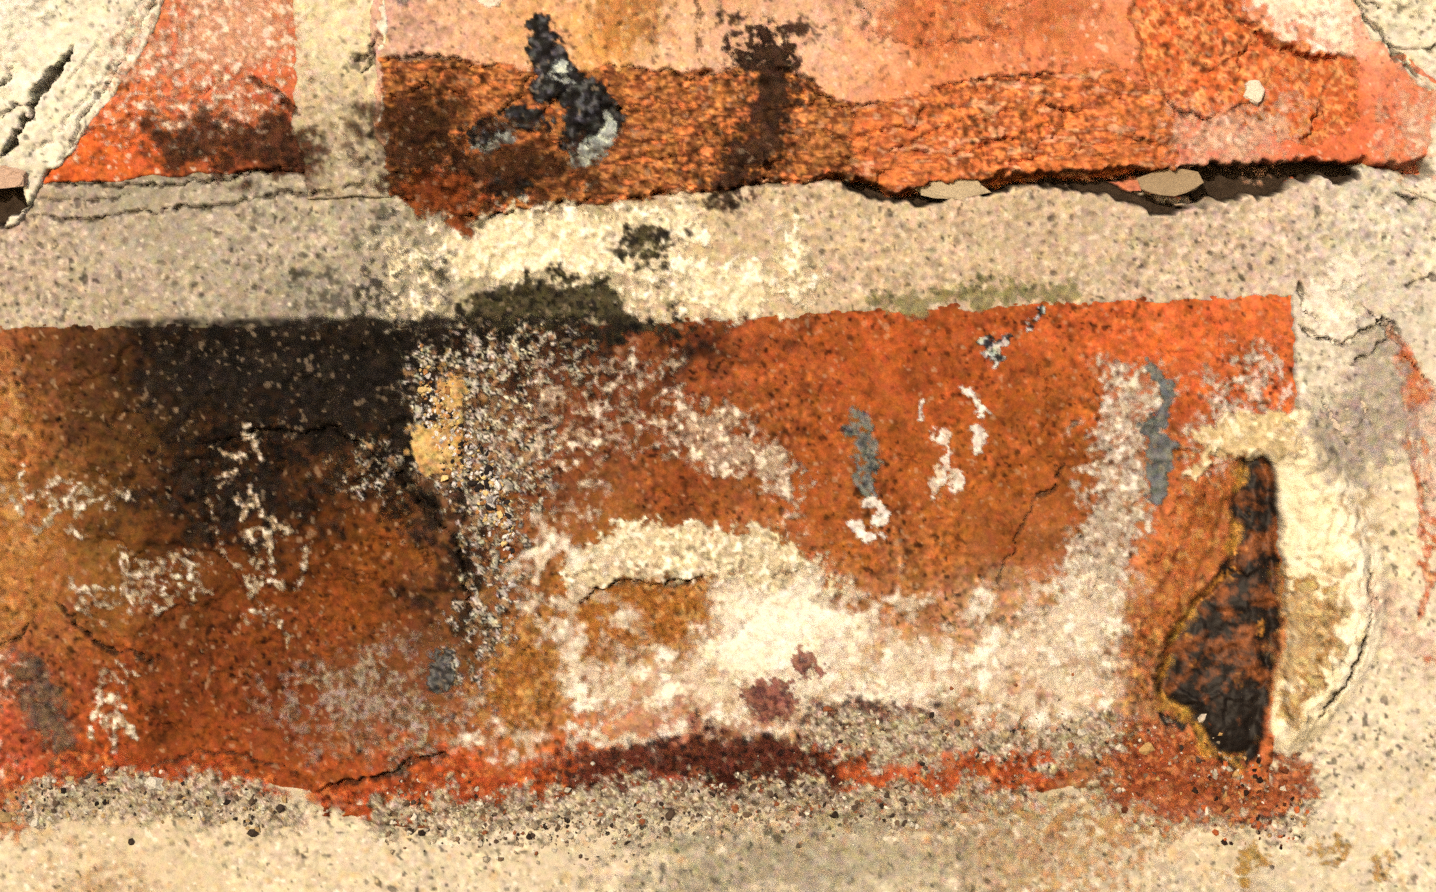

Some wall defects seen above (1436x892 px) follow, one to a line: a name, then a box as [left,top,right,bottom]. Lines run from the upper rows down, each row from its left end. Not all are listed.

spalling [376,0,1360,222]
water stain [1159,85,1310,175]
water stain [1374,80,1436,175]
water stain [0,0,1176,779]
water stain [1182,328,1436,536]
water stain [1367,583,1436,658]
spalling [4,765,318,836]
spalling [357,705,1312,844]